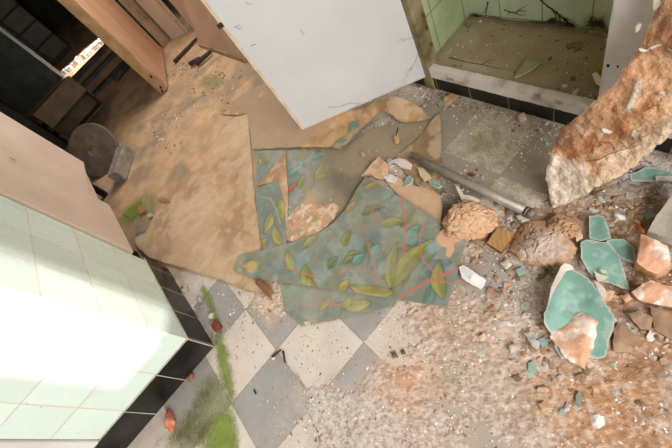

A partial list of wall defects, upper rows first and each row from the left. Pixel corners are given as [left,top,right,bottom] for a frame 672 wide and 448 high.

crack [449,57,516,71]
peeling [332,121,359,149]
flaking render [387,158,442,189]
peeling [629,167,672,182]